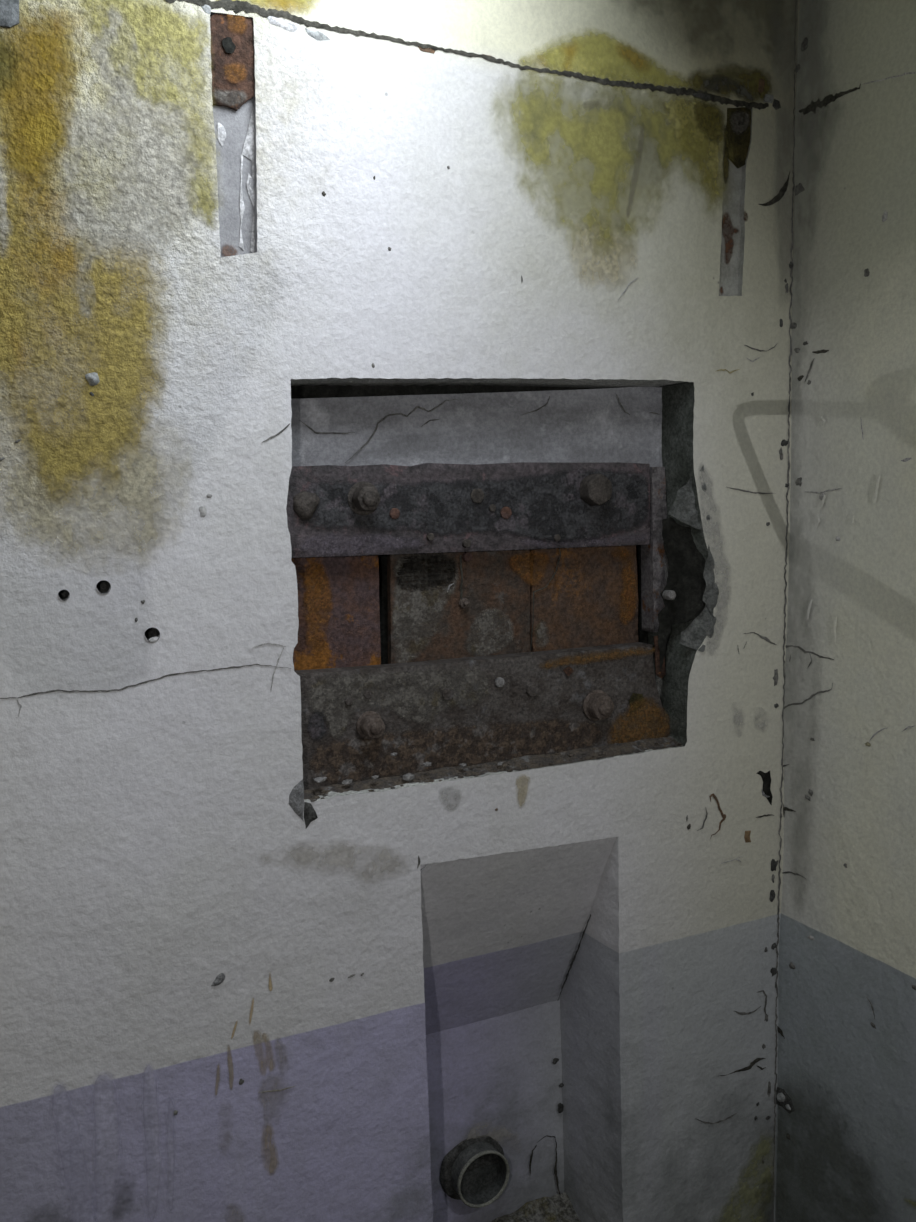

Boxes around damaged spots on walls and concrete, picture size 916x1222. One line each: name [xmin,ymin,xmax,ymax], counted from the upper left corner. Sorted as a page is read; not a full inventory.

crack [165,0,781,110]
leakage [511,32,771,279]
leakage [0,0,216,544]
corrosion [722,212,748,264]
crack [261,399,458,463]
spalling [658,466,719,671]
crack [717,0,916,1218]
crack [0,643,291,714]
corrosion [310,719,602,782]
crack [697,793,742,864]
corrosion [215,999,266,1095]
crack [529,1135,561,1196]